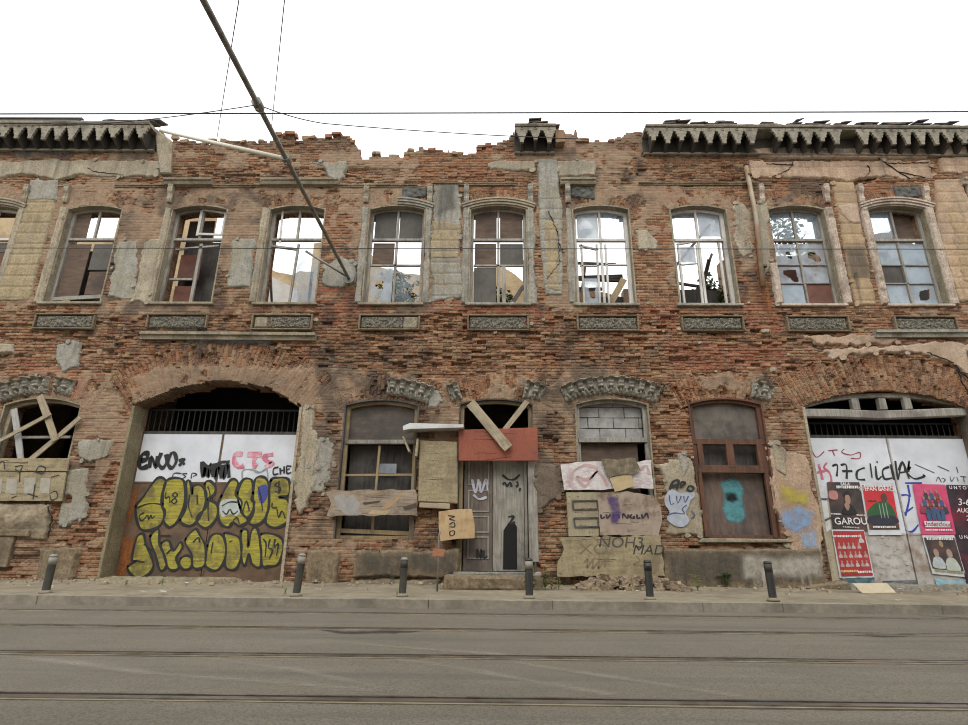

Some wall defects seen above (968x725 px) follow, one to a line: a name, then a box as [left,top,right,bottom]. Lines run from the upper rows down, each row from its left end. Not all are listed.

flaking render [0,157,161,202]
flaking render [487,159,539,172]
flaking render [108,238,161,304]
flaking render [226,237,256,288]
spalling [313,256,381,325]
flaking render [422,180,546,334]
flaking render [635,230,658,251]
flaking render [732,200,774,275]
flaking render [748,156,968,307]
spalling [640,301,792,373]
flaking render [801,334,968,377]
flaking render [293,404,337,515]